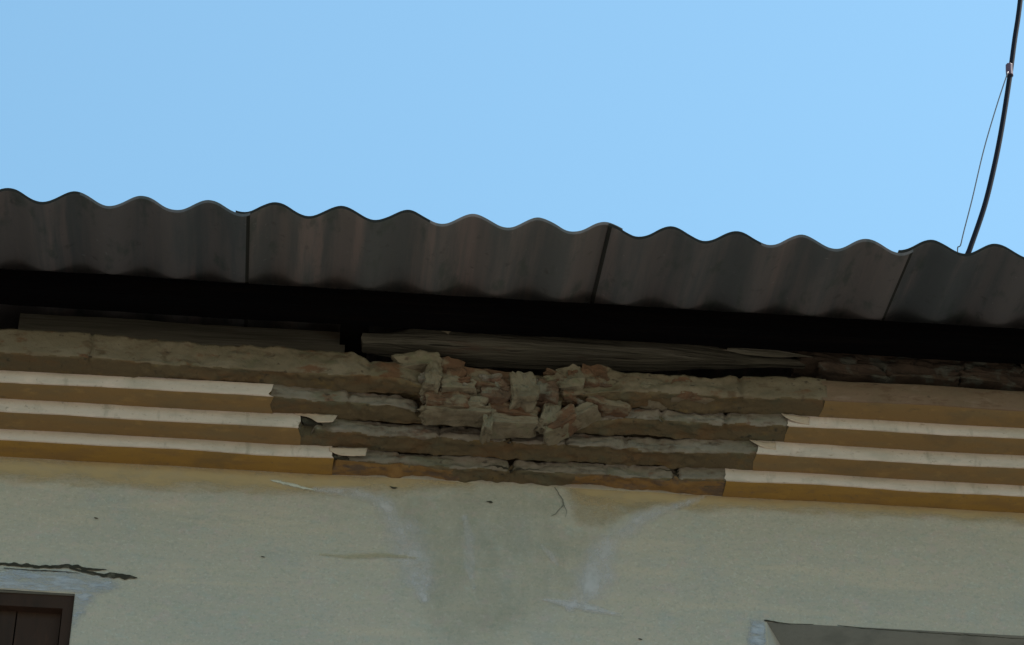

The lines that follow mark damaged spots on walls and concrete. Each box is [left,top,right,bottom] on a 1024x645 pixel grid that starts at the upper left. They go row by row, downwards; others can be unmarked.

spalling [0,329,1024,496]
crack [483,442,567,516]
crack [0,562,137,580]